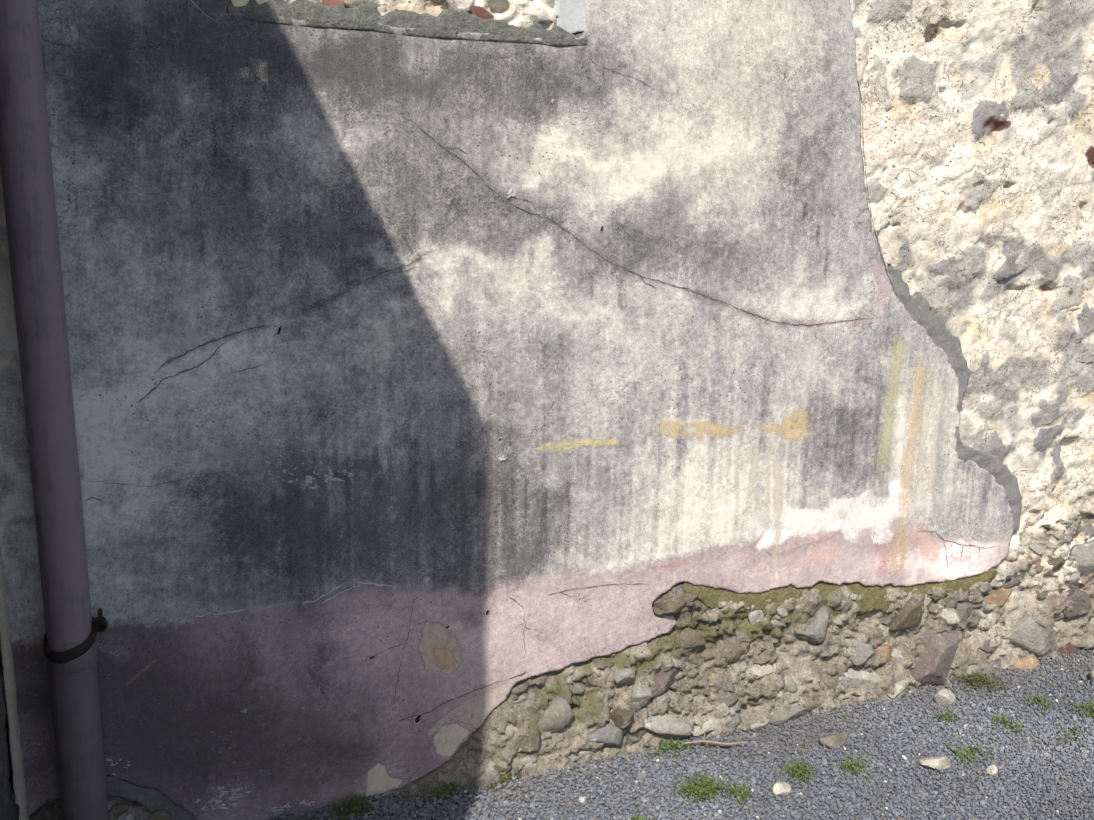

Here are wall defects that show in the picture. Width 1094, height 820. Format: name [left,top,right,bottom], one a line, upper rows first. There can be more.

spalling [227,0,587,47]
crack [395,81,898,326]
crack [140,249,435,401]
leakage [735,446,837,571]
crack [367,595,531,722]
crack [549,583,648,597]
spalling [366,476,1094,800]
spalling [29,798,62,820]
spalling [106,758,251,820]